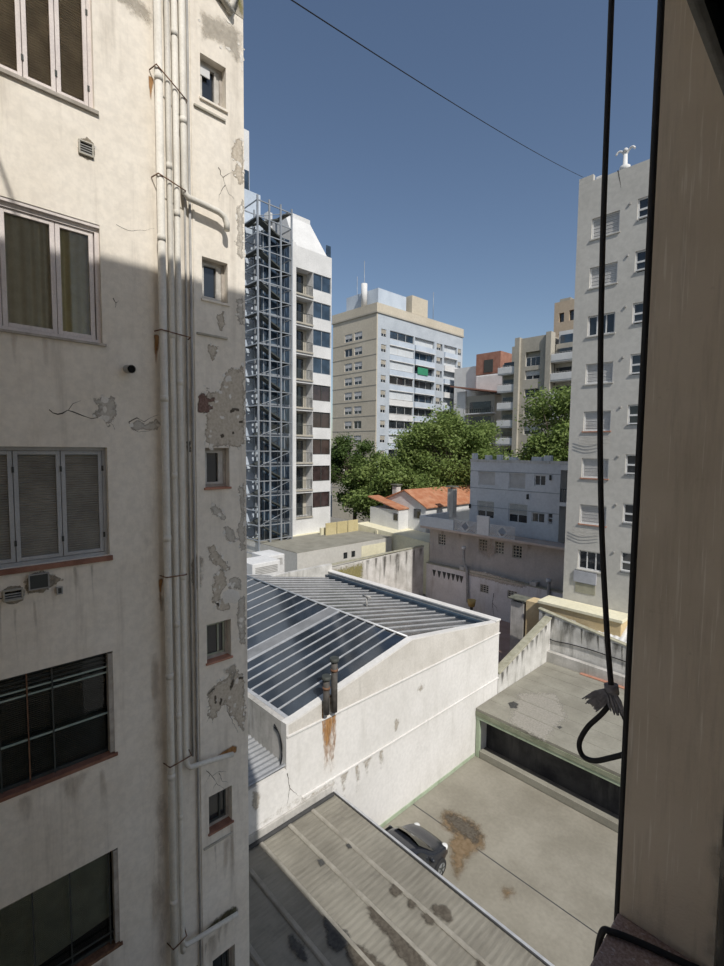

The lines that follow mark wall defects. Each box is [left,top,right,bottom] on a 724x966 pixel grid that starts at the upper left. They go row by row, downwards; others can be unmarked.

leakage [120,0,149,21]
peeling [231,138,245,185]
crack [49,399,157,432]
spalling [197,362,246,450]
peeling [206,483,248,647]
spalling [207,670,246,731]
corrosion [322,709,336,752]
leakage [324,916,384,966]
leakage [368,907,426,966]